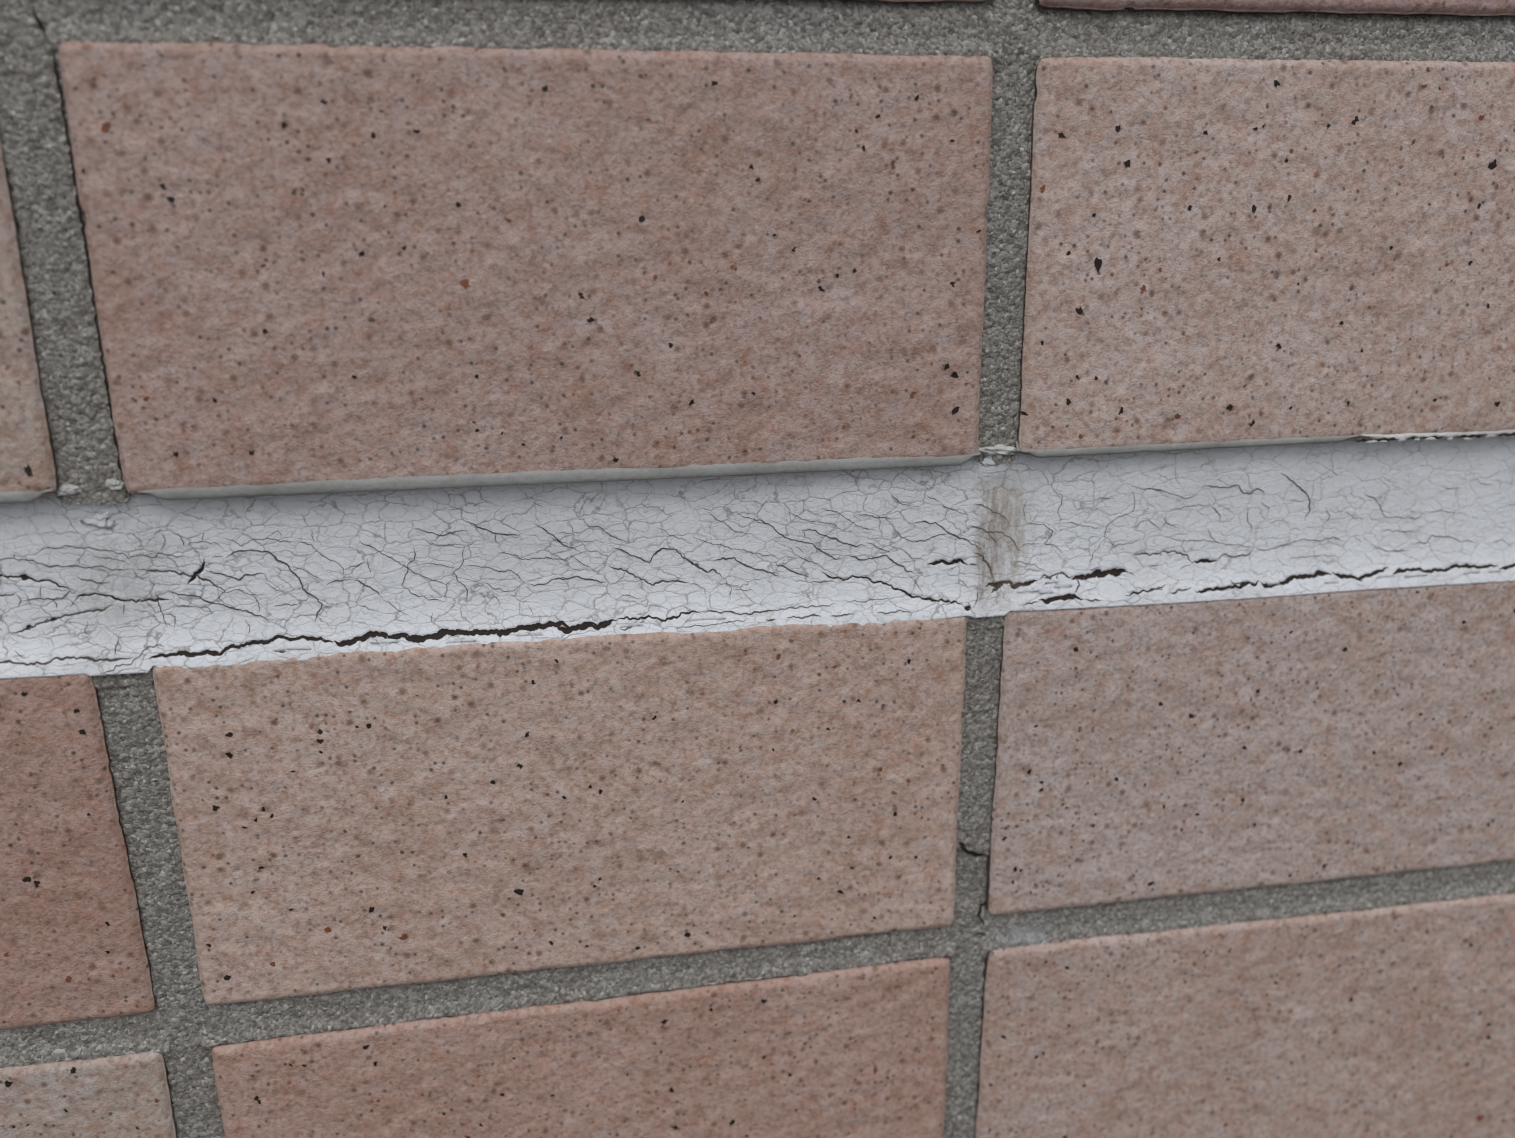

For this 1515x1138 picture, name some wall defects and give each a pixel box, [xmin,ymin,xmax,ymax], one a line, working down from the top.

crack [0,471,1515,673]